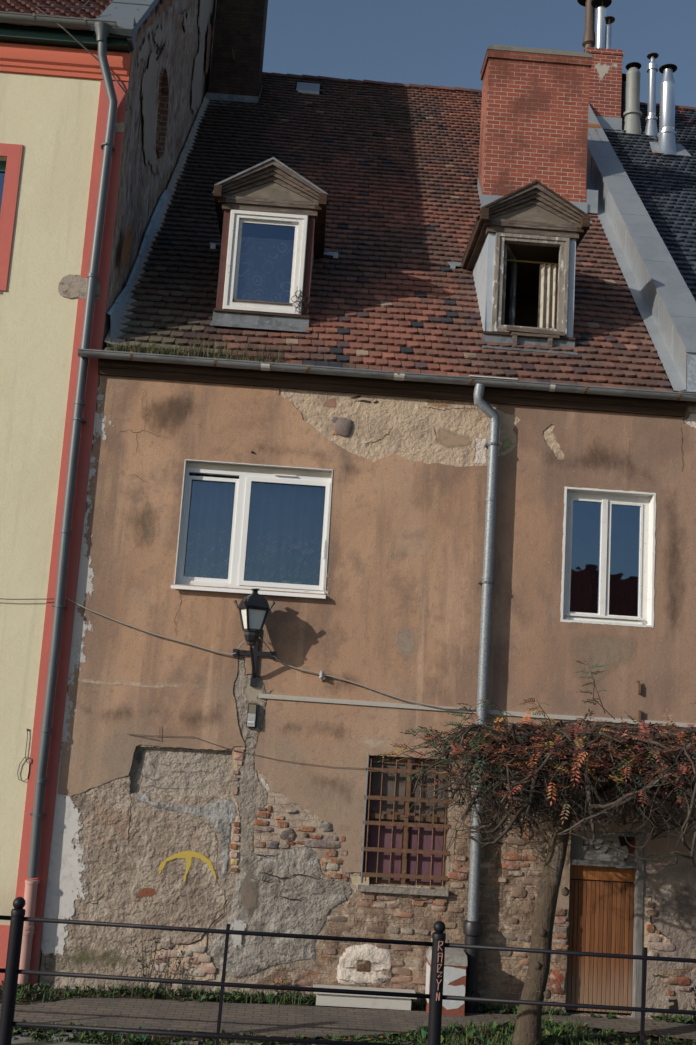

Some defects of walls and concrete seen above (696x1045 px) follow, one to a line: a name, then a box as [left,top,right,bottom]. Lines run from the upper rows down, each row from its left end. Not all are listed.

flaking render [138,0,174,174]
flaking render [183,0,214,113]
spalling [279,388,520,467]
spalling [542,424,564,460]
spalling [684,406,696,428]
flaking render [41,387,245,981]
crack [135,736,256,790]
crack [252,853,321,900]
flaking render [253,771,350,881]
flaking render [253,821,552,1010]
flaking render [542,908,570,1010]
flaking render [642,855,696,1021]